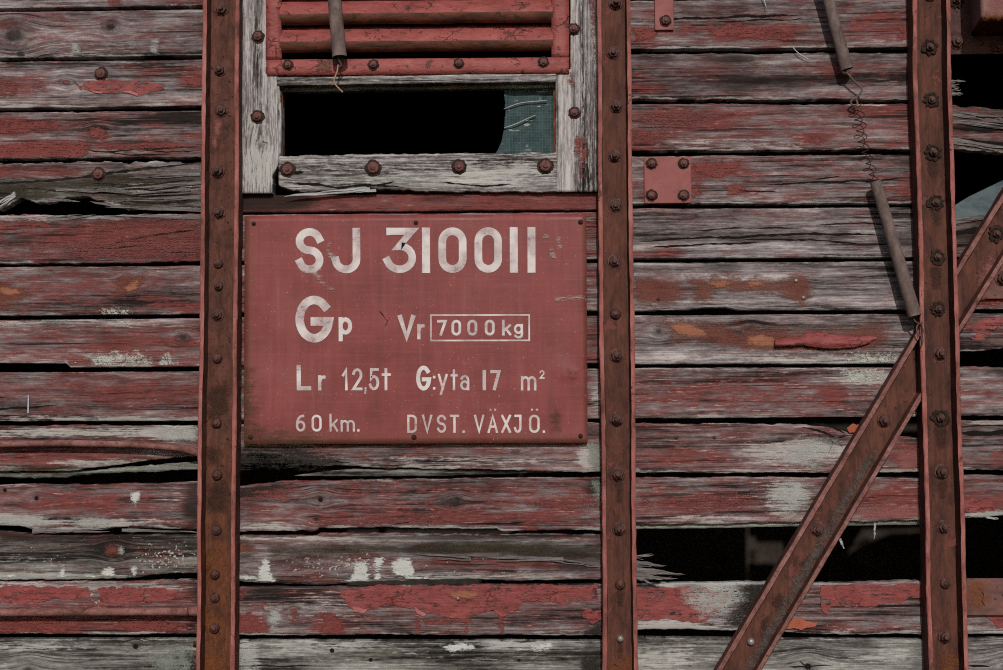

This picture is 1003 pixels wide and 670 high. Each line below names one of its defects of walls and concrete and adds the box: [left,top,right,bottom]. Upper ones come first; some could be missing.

peeling [64,79,164,96]
crack [0,147,201,204]
crack [65,230,191,253]
rust [667,319,888,352]
peeling [747,331,877,349]
peeling [971,318,1003,341]
rust [857,507,919,518]
peeling [0,585,178,605]
peeling [340,583,599,619]
peeling [787,583,921,630]
peeling [119,617,184,632]